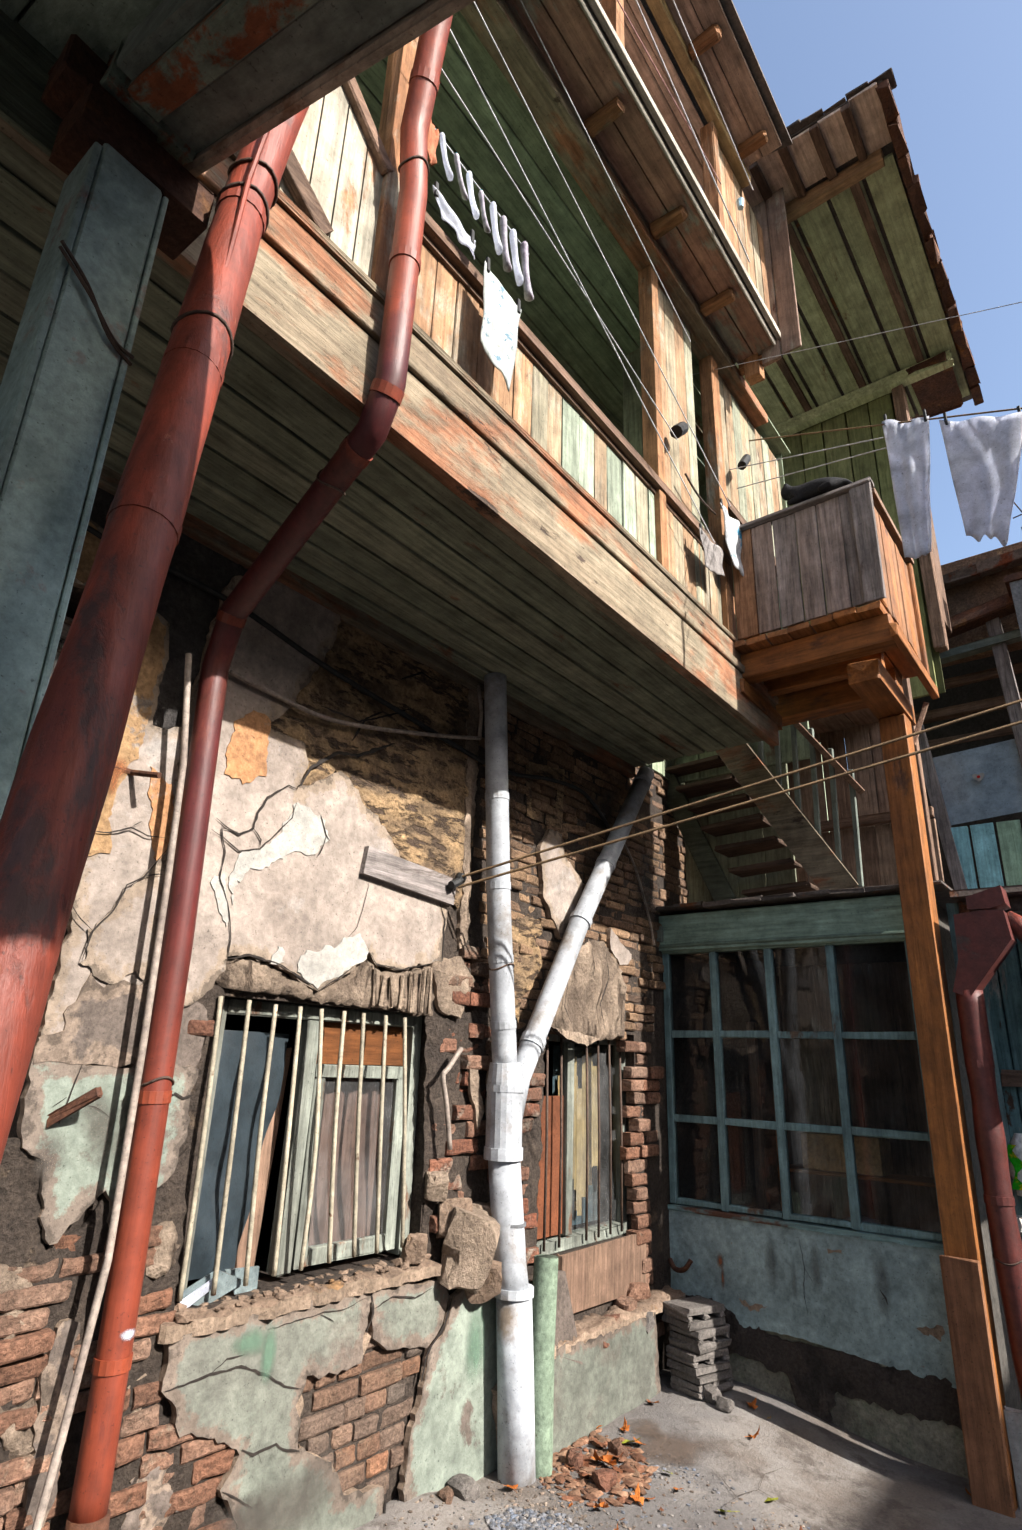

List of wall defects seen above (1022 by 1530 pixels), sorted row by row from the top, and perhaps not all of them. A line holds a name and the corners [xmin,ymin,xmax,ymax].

peeling [75,521,101,583]
peeling [269,933,369,989]
crack [213,671,446,990]
flaking render [210,620,479,927]
flaking render [0,1137,110,1530]
flaking render [108,1146,236,1530]
crack [165,1288,453,1392]